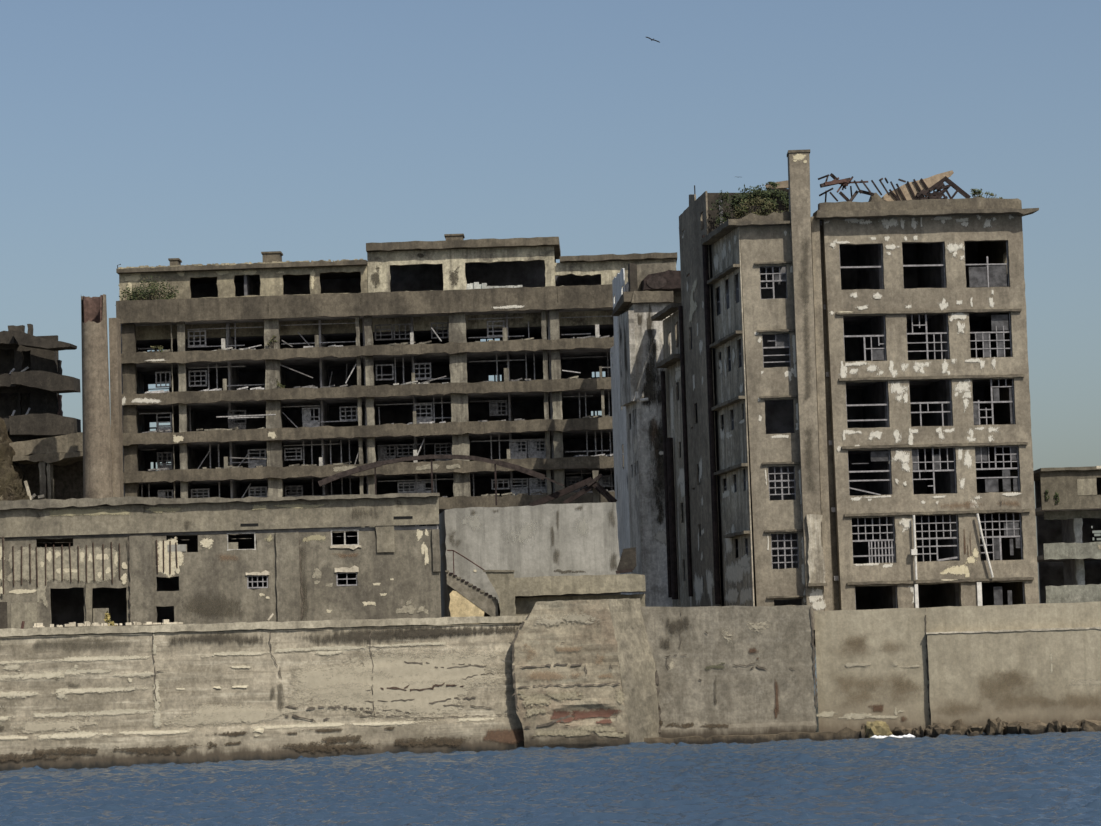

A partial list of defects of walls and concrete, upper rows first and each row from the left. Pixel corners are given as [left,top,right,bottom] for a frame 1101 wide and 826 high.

peeling [844,215,996,255]
peeling [946,242,965,259]
peeling [687,277,704,356]
peeling [829,293,882,315]
peeling [939,297,973,333]
water stain [638,306,663,407]
peeling [671,366,703,431]
peeling [840,357,996,412]
water stain [648,421,665,524]
spalling [0,537,128,607]
peeling [694,524,753,606]
peeling [801,537,826,611]